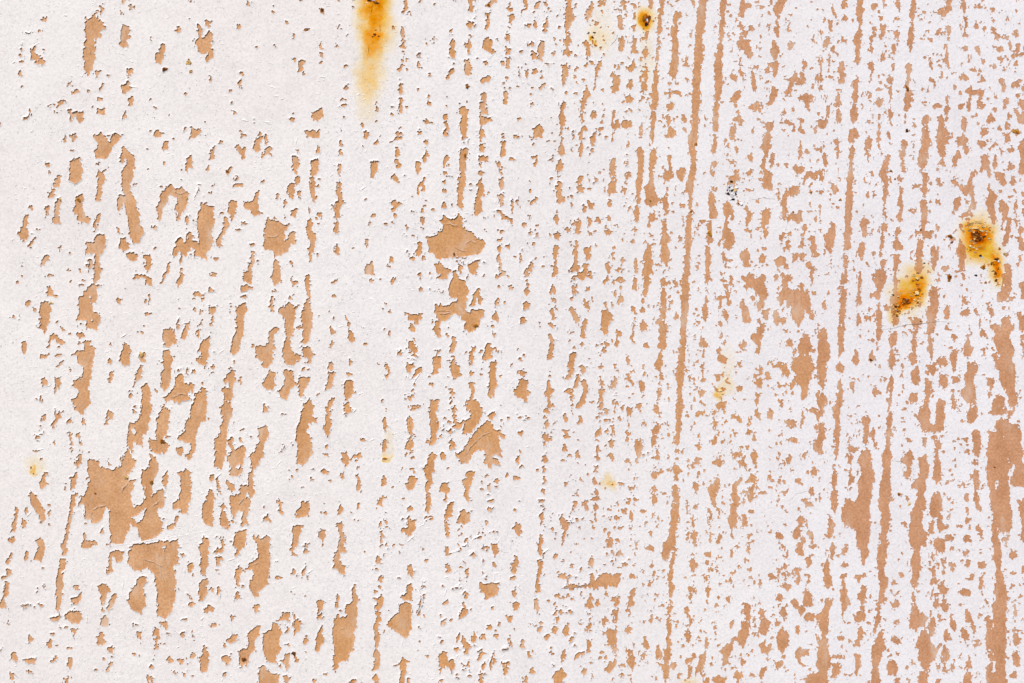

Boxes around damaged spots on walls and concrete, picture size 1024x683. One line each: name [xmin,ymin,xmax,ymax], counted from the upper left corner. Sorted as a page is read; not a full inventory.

peeling [0,0,370,683]
peeling [346,0,1024,683]
corrosion [892,263,925,317]
corrosion [948,220,1008,284]